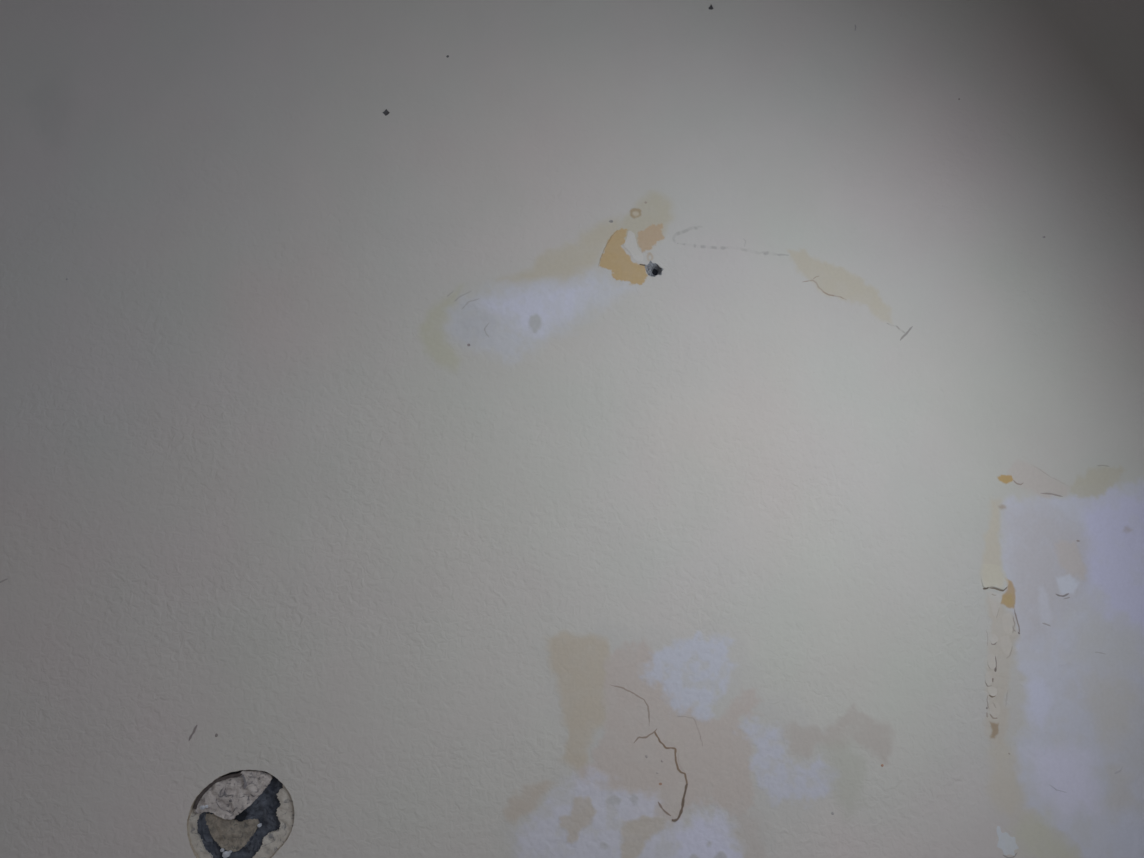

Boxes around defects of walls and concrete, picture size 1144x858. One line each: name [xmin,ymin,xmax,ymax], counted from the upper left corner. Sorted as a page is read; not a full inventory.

peeling [598,207,666,286]
crack [610,684,703,822]
spalling [187,770,294,858]